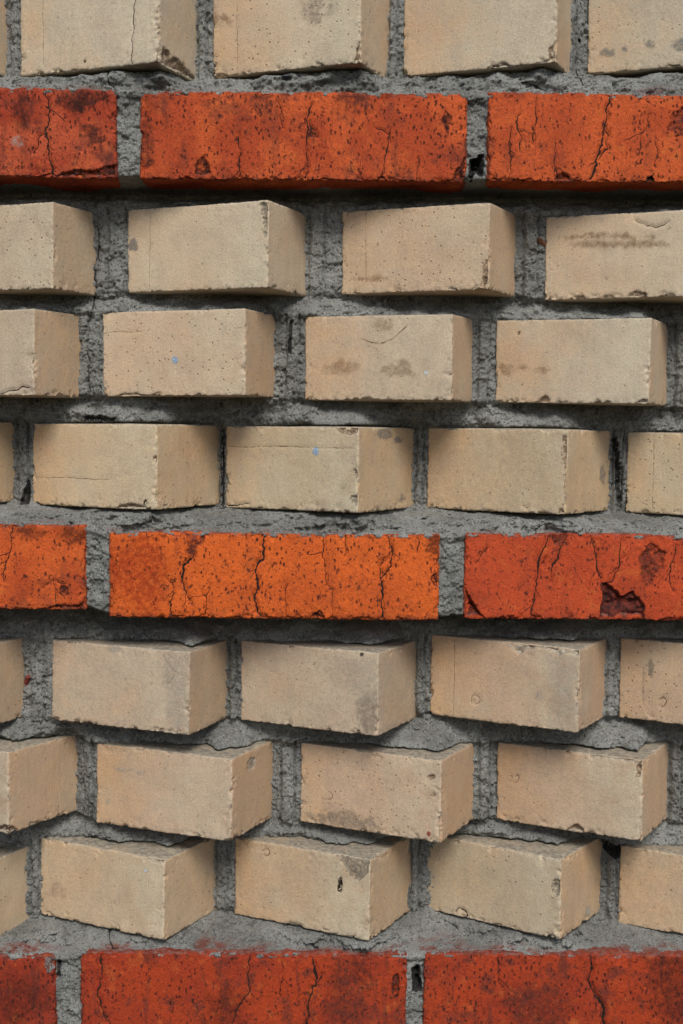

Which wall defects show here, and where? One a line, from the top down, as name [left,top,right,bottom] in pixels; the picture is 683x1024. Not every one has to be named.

crack [34,93,66,174]
crack [508,81,659,180]
crack [165,556,211,616]
crack [249,536,288,616]
crack [380,537,420,618]
crack [522,536,626,616]
spalling [600,543,665,618]